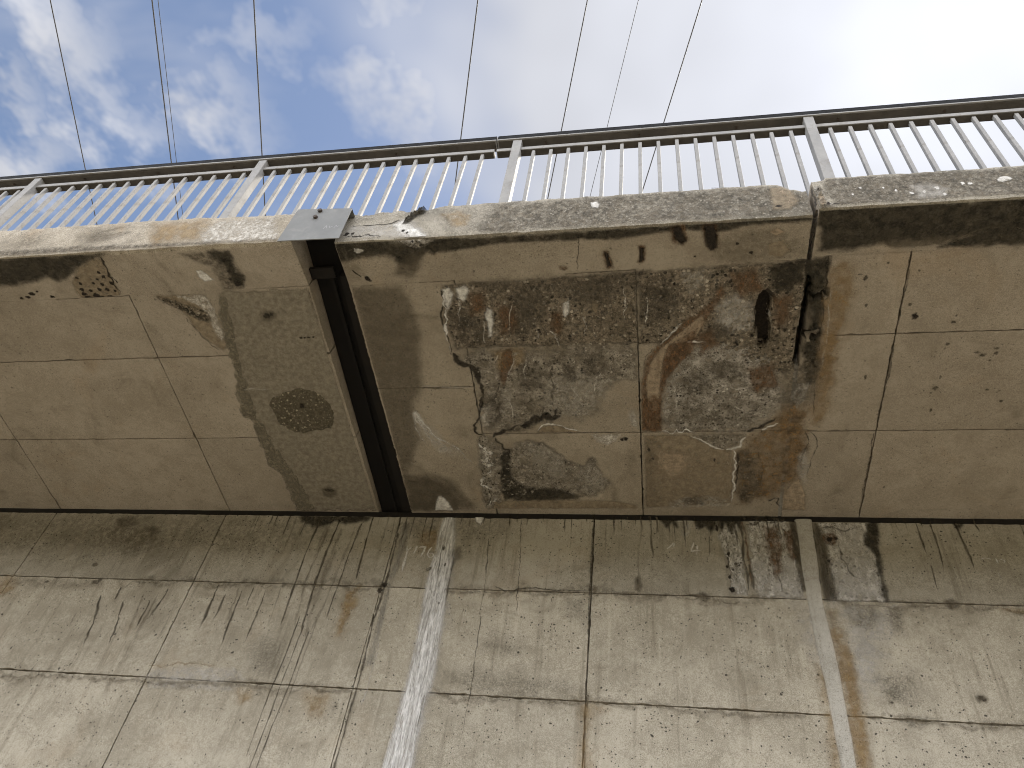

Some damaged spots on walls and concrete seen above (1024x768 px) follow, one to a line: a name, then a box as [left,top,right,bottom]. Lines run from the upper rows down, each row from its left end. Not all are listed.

spalling [269,388,334,433]
water stain [335,221,428,275]
water stain [355,289,485,768]
spalling [463,343,638,431]
spalling [500,441,610,500]
rust [642,287,724,431]
water stain [613,516,806,597]
crack [691,419,778,502]
spalling [661,275,810,434]
rust [738,383,818,510]
crack [809,188,829,407]
crack [861,255,911,497]